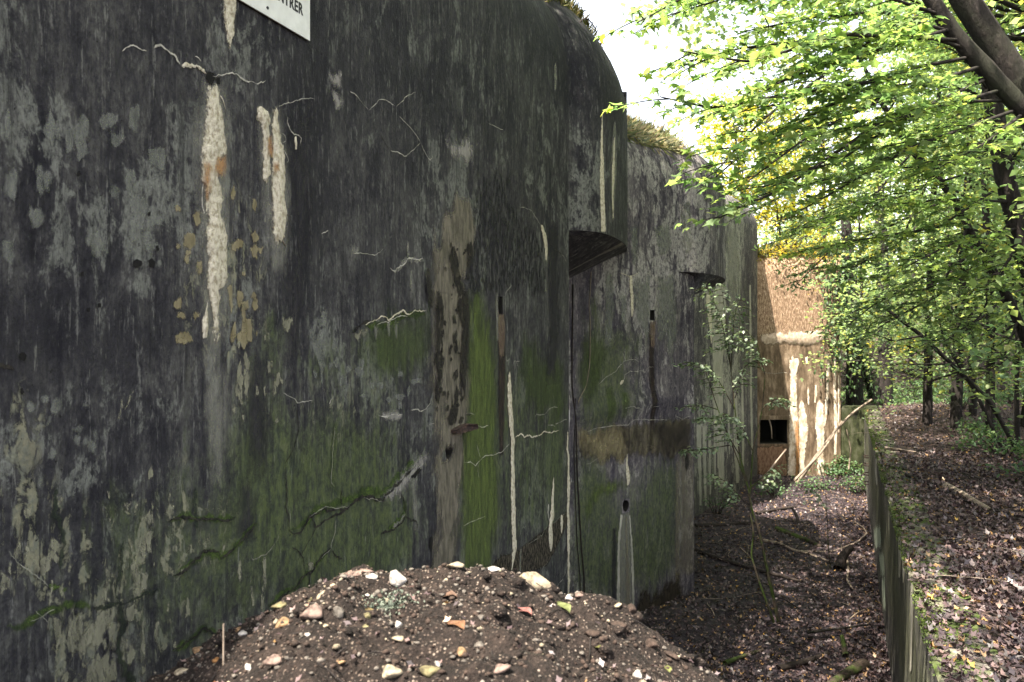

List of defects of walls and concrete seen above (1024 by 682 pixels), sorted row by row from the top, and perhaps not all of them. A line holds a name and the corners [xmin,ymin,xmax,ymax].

crack [123,44,265,85]
crack [351,92,472,161]
crack [353,309,426,341]
corrosion [498,286,511,454]
crack [8,393,421,682]
leakage [386,456,427,500]
efflorescence [506,358,519,570]
crack [465,397,566,476]
leakage [547,429,630,594]
leakage [612,515,682,612]